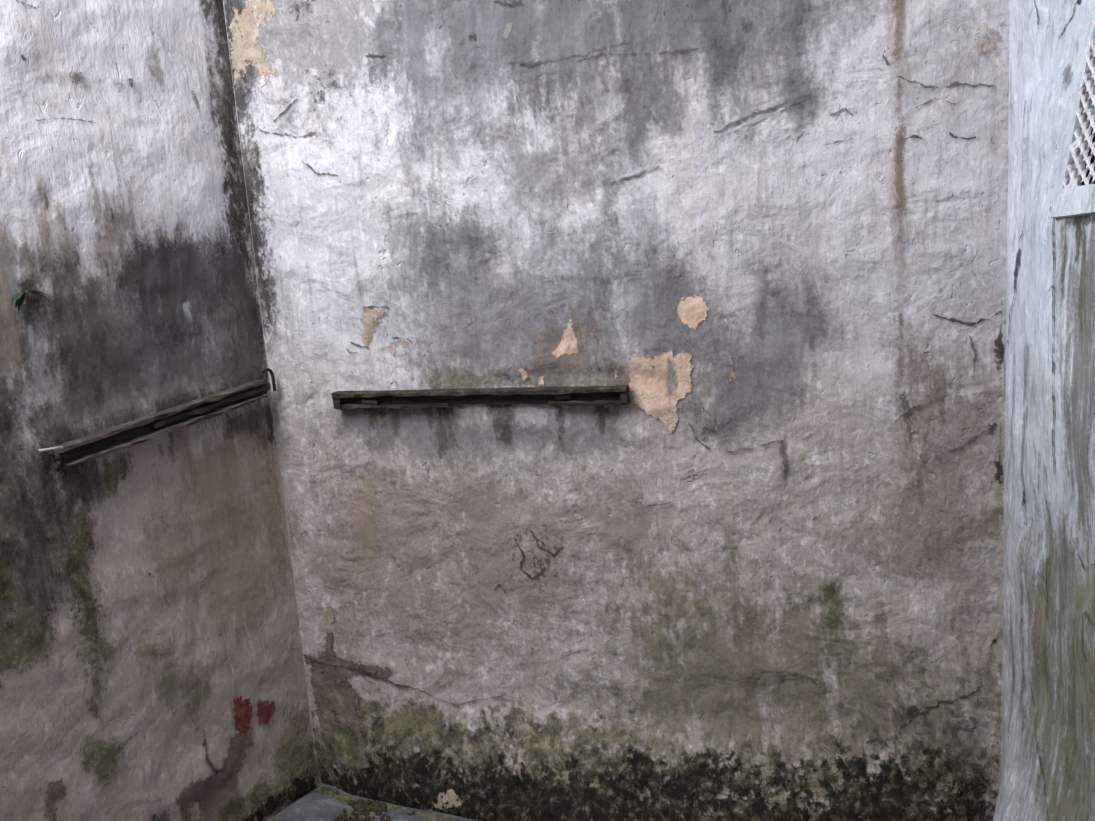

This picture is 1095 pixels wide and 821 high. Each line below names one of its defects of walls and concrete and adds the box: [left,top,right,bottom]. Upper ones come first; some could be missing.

peeling [229,0,283,87]
corrosion [883,0,904,66]
corrosion [894,120,905,211]
peeling [346,305,389,353]
damp [0,0,838,688]
peeling [518,368,544,386]
peeling [552,319,578,358]
peeling [615,350,693,433]
peeling [677,295,709,331]
damp [1059,215,1095,605]
damp [856,346,1034,630]
damp [586,567,1045,821]